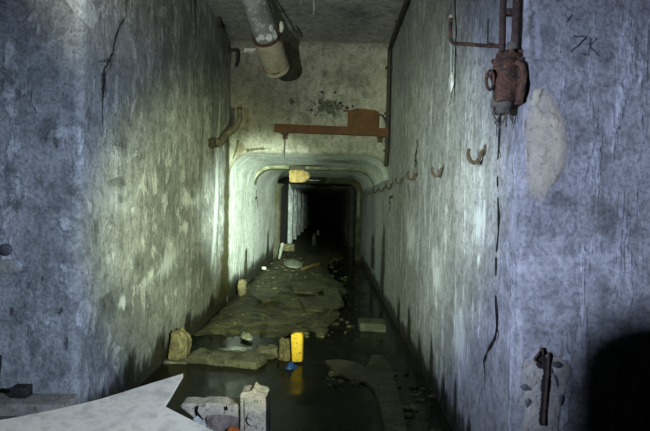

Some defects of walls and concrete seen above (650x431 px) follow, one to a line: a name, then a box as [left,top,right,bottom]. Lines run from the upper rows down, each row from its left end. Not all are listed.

crack [98,2,126,116]
mould [309,91,354,117]
crack [494,117,502,159]
crack [493,176,501,276]
crack [483,295,499,389]
spalling [520,347,571,431]